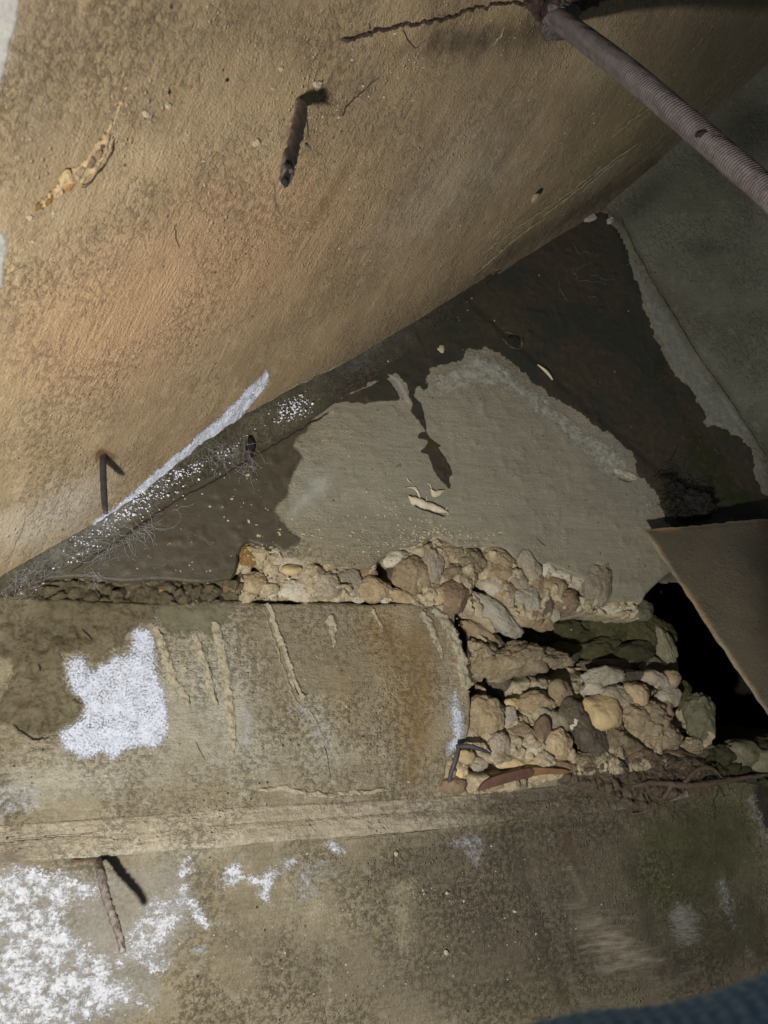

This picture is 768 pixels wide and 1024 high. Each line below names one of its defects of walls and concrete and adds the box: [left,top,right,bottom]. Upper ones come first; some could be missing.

crack [340,1,547,49]
spalling [35,85,128,211]
water stain [92,370,270,525]
peeling [407,478,449,517]
water stain [0,418,312,763]
water stain [0,855,210,1024]